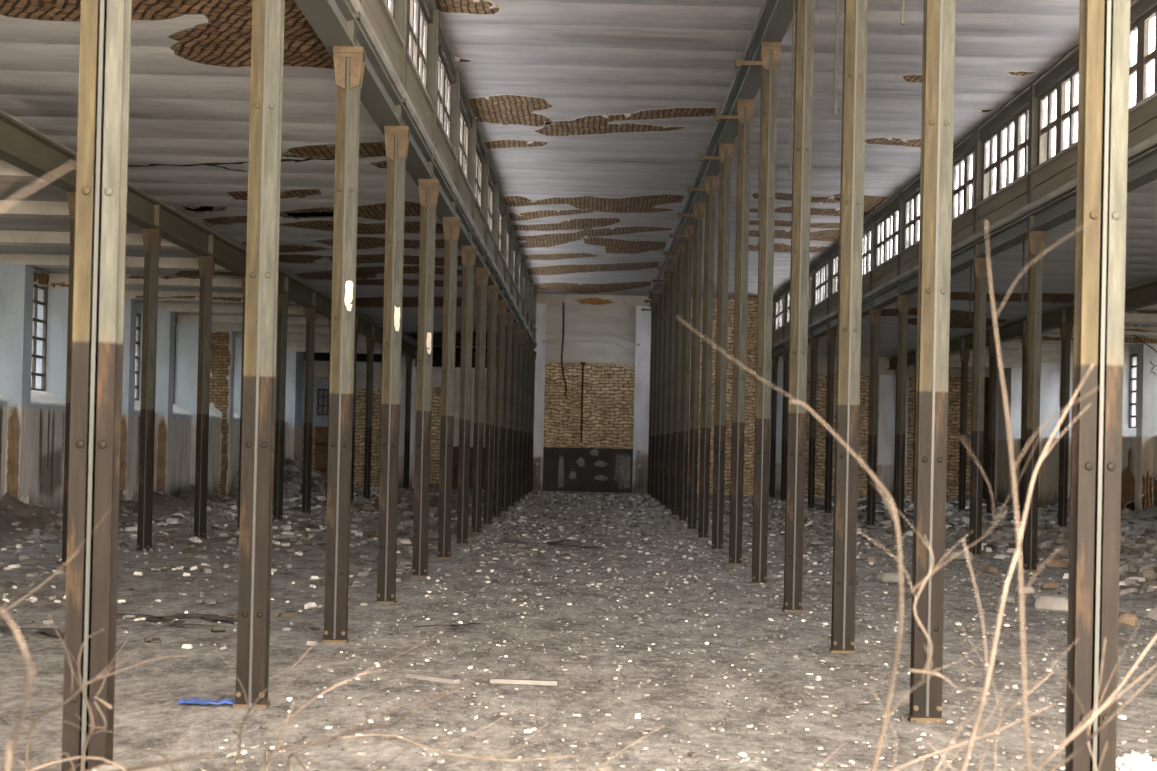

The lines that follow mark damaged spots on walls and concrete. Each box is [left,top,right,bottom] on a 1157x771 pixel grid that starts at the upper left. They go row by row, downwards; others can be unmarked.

spalling [0,0,81,22]
spalling [132,0,253,68]
spalling [283,0,334,69]
spalling [434,0,501,15]
spalling [281,144,335,159]
spalling [359,142,387,169]
spalling [468,94,719,149]
spalling [279,189,334,280]
spalling [344,201,421,332]
spalling [503,194,685,294]
water stain [0,411,20,499]
water stain [39,412,65,494]